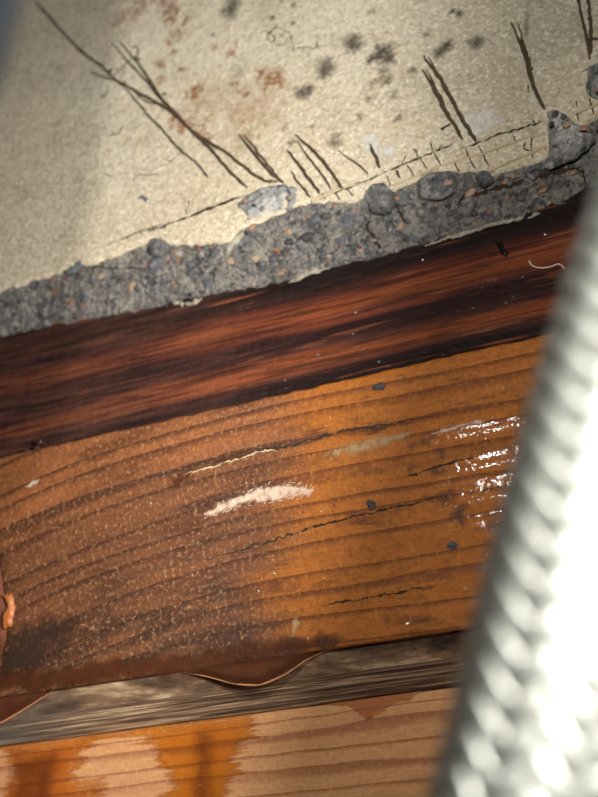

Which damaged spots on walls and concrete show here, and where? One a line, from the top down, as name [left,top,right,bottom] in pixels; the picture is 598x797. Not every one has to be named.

crack [249,23,318,51]
damp [346,34,362,49]
damp [320,60,332,78]
damp [368,44,394,72]
peeling [458,109,499,136]
crack [316,120,544,202]
spalling [0,118,598,337]
damp [0,714,258,797]